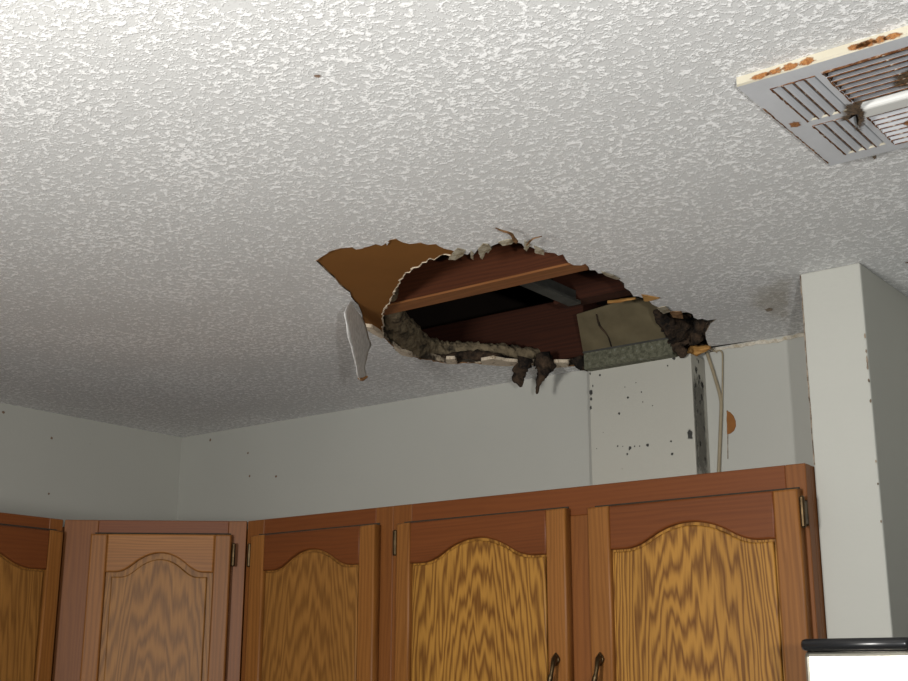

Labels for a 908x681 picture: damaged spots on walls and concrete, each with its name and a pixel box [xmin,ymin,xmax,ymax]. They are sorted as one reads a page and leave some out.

rust [752,57,814,80]
rust [763,33,908,164]
peeling [316,239,454,381]
peeling [481,356,518,366]
peeling [554,359,569,368]
leakage [687,360,707,473]